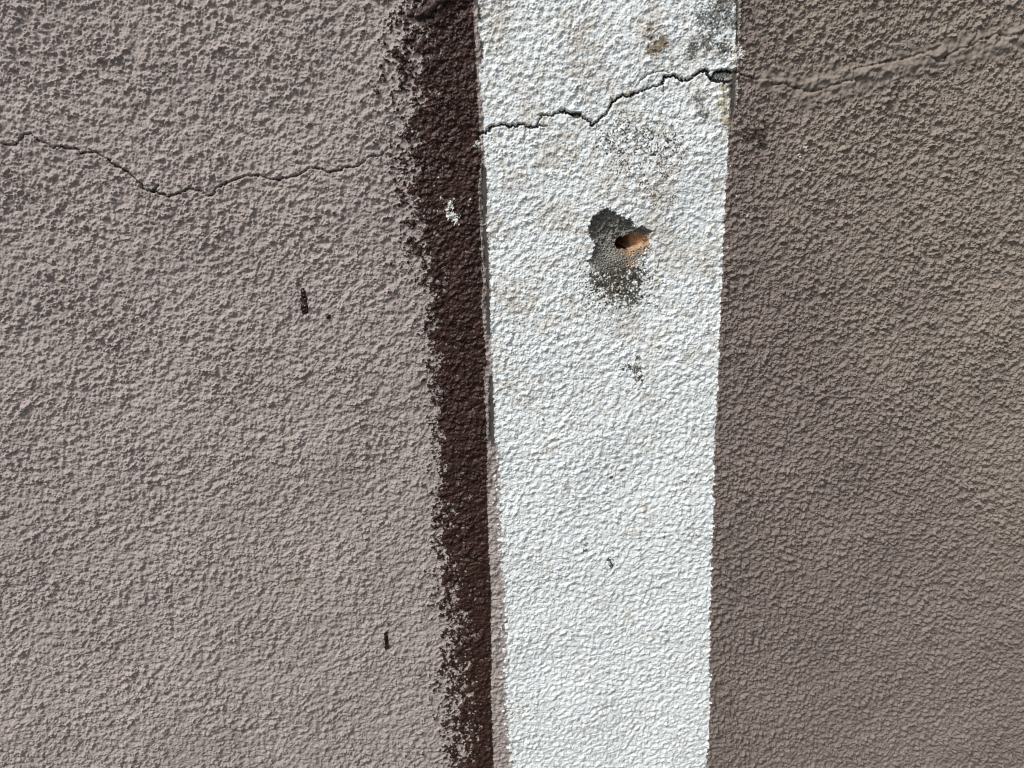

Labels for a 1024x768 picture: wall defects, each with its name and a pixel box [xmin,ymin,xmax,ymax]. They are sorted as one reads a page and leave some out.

crack [410,32,1023,152]
crack [3,133,384,198]
spalling [585,208,652,273]